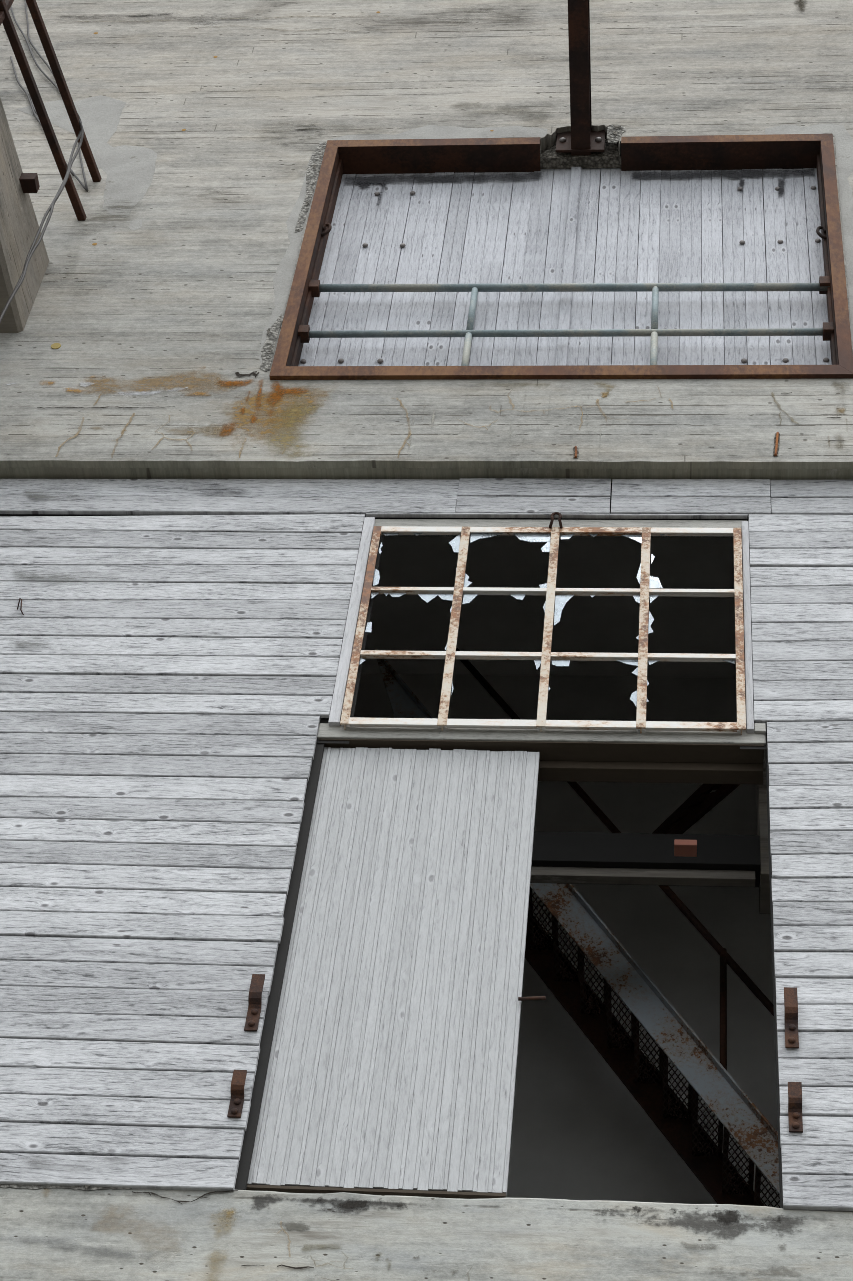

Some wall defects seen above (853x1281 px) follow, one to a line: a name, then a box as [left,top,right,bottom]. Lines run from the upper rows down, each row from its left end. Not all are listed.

corrosion [48,374,315,435]
damp [713,1210,741,1224]